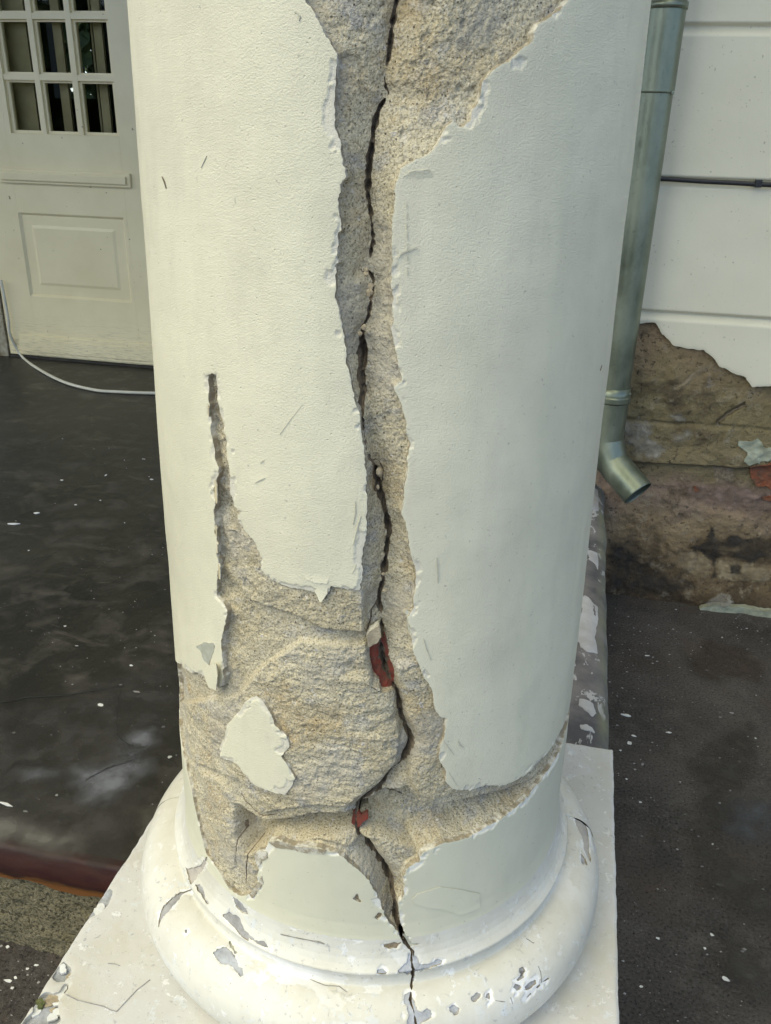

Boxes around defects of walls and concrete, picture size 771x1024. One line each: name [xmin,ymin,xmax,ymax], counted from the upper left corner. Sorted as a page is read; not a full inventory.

spalling [160,0,563,1024]
crack [355,0,417,1024]
spalling [588,322,771,608]
spalling [26,964,71,1024]
spalling [89,889,113,918]